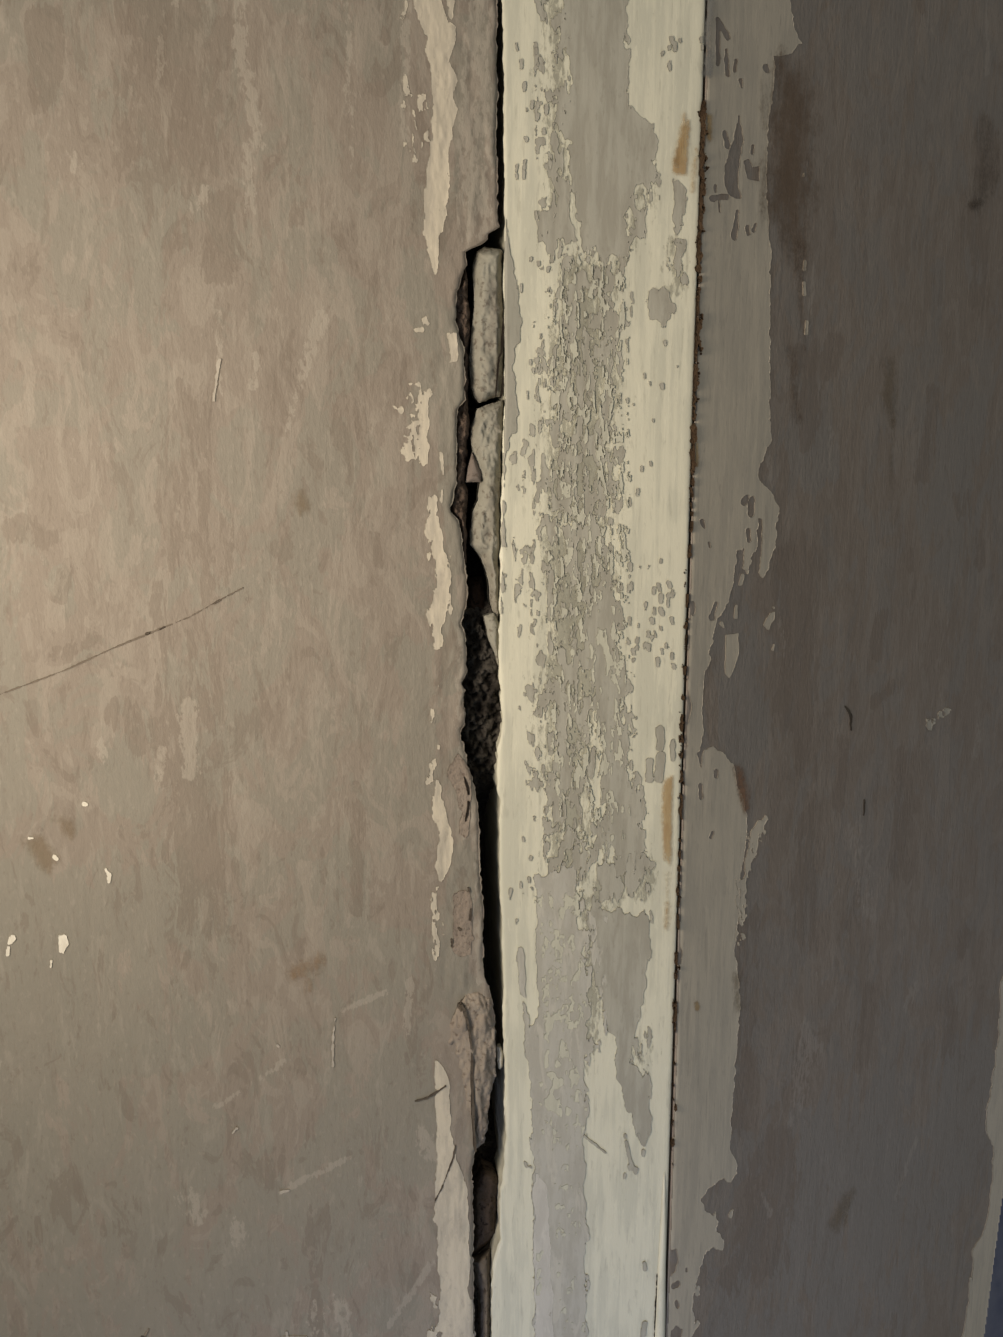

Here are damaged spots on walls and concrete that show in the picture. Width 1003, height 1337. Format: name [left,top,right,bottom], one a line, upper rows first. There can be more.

peeling [400,0,458,275]
crack [4,587,243,693]
peeling [393,382,453,650]
peeling [447,332,458,363]
flaking render [465,452,481,482]
crack [450,242,502,974]
peeling [483,0,802,1337]
rust [662,100,712,930]
rust [669,951,681,1165]
crack [435,1098,498,1337]